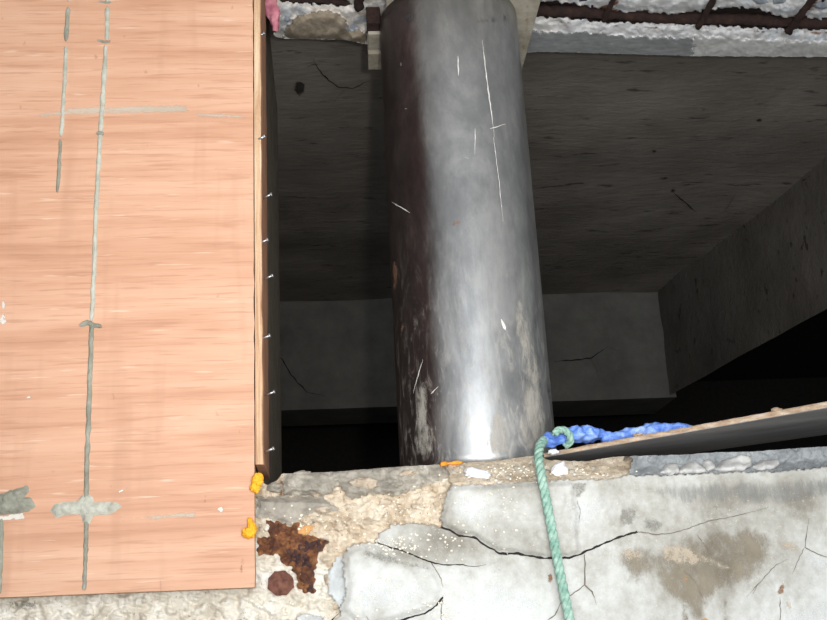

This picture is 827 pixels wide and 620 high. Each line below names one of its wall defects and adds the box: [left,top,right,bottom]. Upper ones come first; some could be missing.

spalling [274,0,386,44]
spalling [527,0,827,57]
crack [313,59,365,105]
rust [256,520,329,594]
spalling [0,447,827,620]
crack [377,507,768,620]
leakage [623,530,763,620]
crack [750,522,826,593]